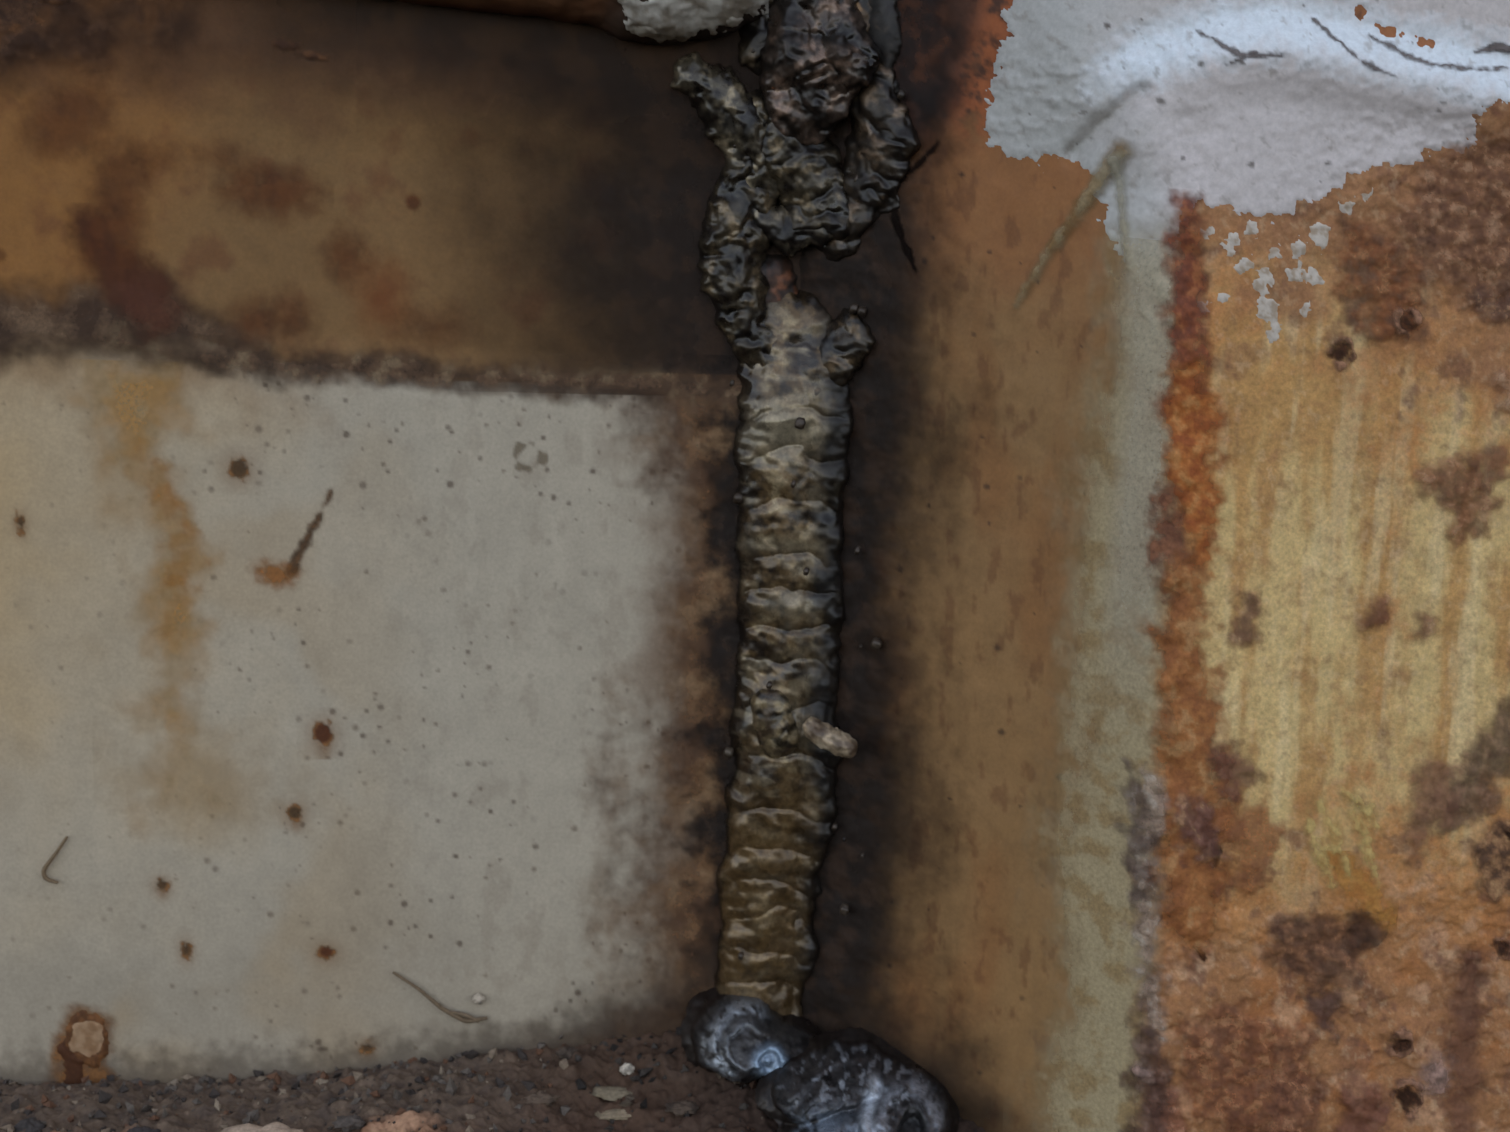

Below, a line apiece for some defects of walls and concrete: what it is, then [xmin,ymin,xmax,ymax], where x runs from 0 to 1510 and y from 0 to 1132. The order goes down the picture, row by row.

peeling [618,0,769,43]
crack [1197,31,1282,63]
crack [1312,18,1510,73]
peeling [984,0,1510,345]
rust [1138,195,1240,960]
rust [1230,594,1259,644]
rust [1364,599,1389,627]
rust [1323,851,1397,925]
rust [52,1007,116,1085]
rust [1121,1027,1173,1132]
rust [1421,956,1482,1132]